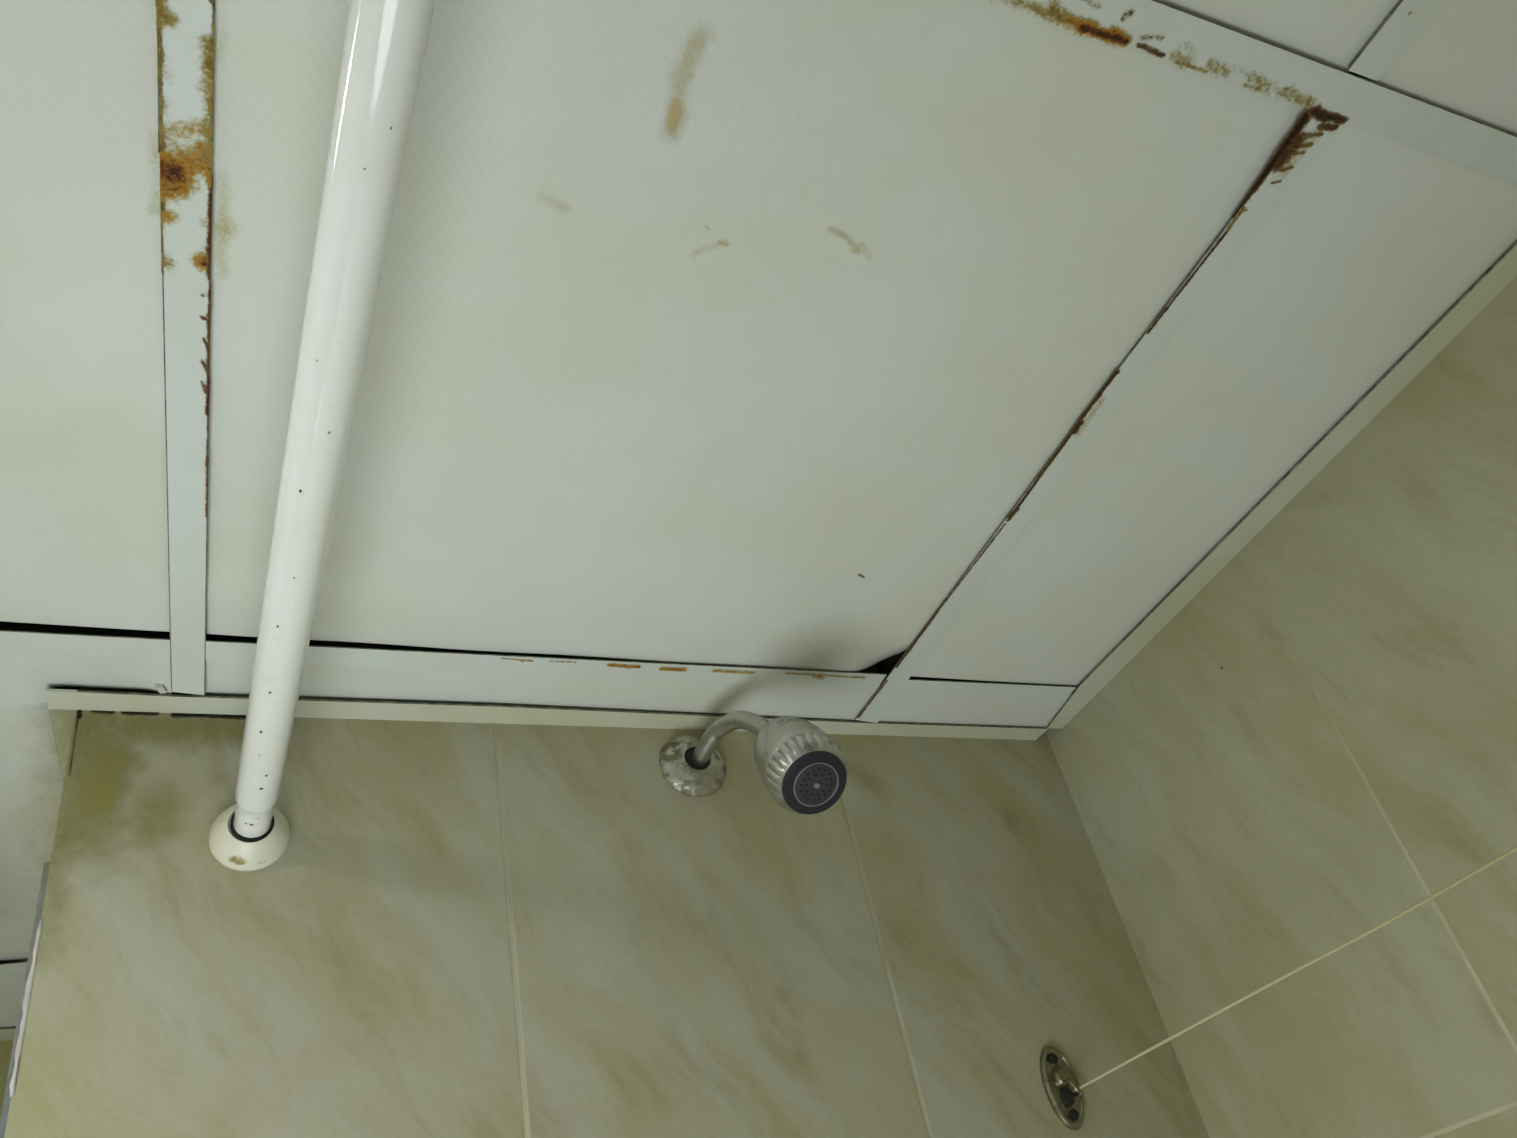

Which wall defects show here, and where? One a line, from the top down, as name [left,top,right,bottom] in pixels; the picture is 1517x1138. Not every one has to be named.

rust [155,0,215,517]
rust [1008,0,1349,334]
rust [785,370,1120,718]